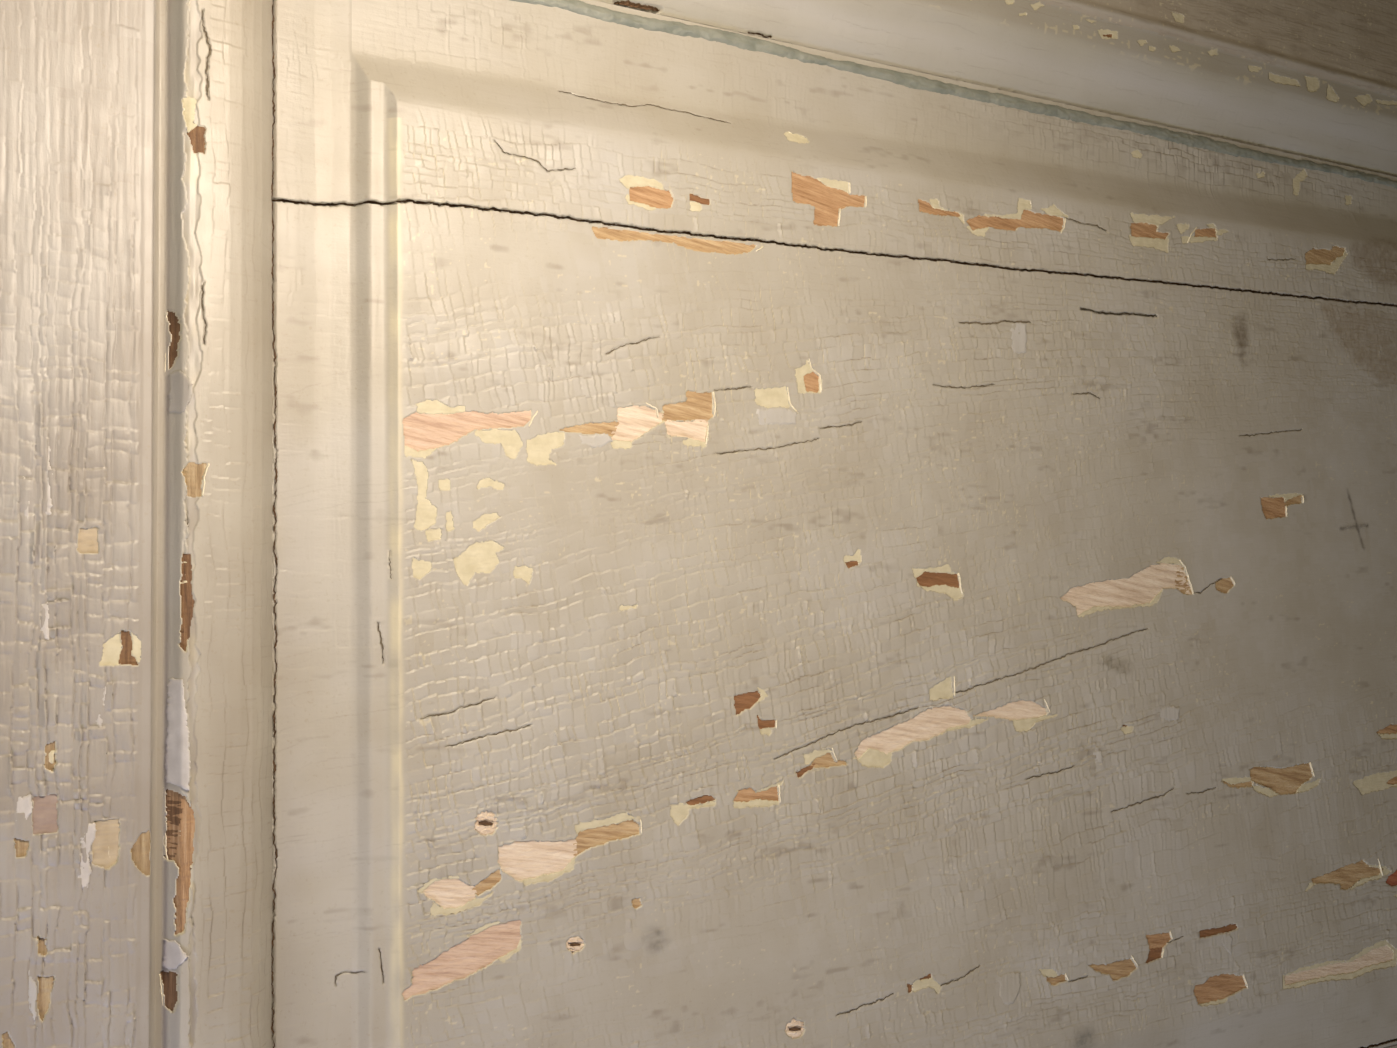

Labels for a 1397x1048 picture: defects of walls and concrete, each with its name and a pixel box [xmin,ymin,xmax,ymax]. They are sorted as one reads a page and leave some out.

crack [202,11,212,97]
peeling [792,171,867,227]
crack [200,283,208,344]
peeling [402,390,716,542]
crack [271,0,1397,863]
peeling [1060,557,1195,617]
peeling [733,676,1057,808]
peeling [78,678,195,1011]
peeling [417,812,642,916]
crack [270,868,278,1048]
crack [335,950,384,984]
crack [1360,1038,1397,1048]